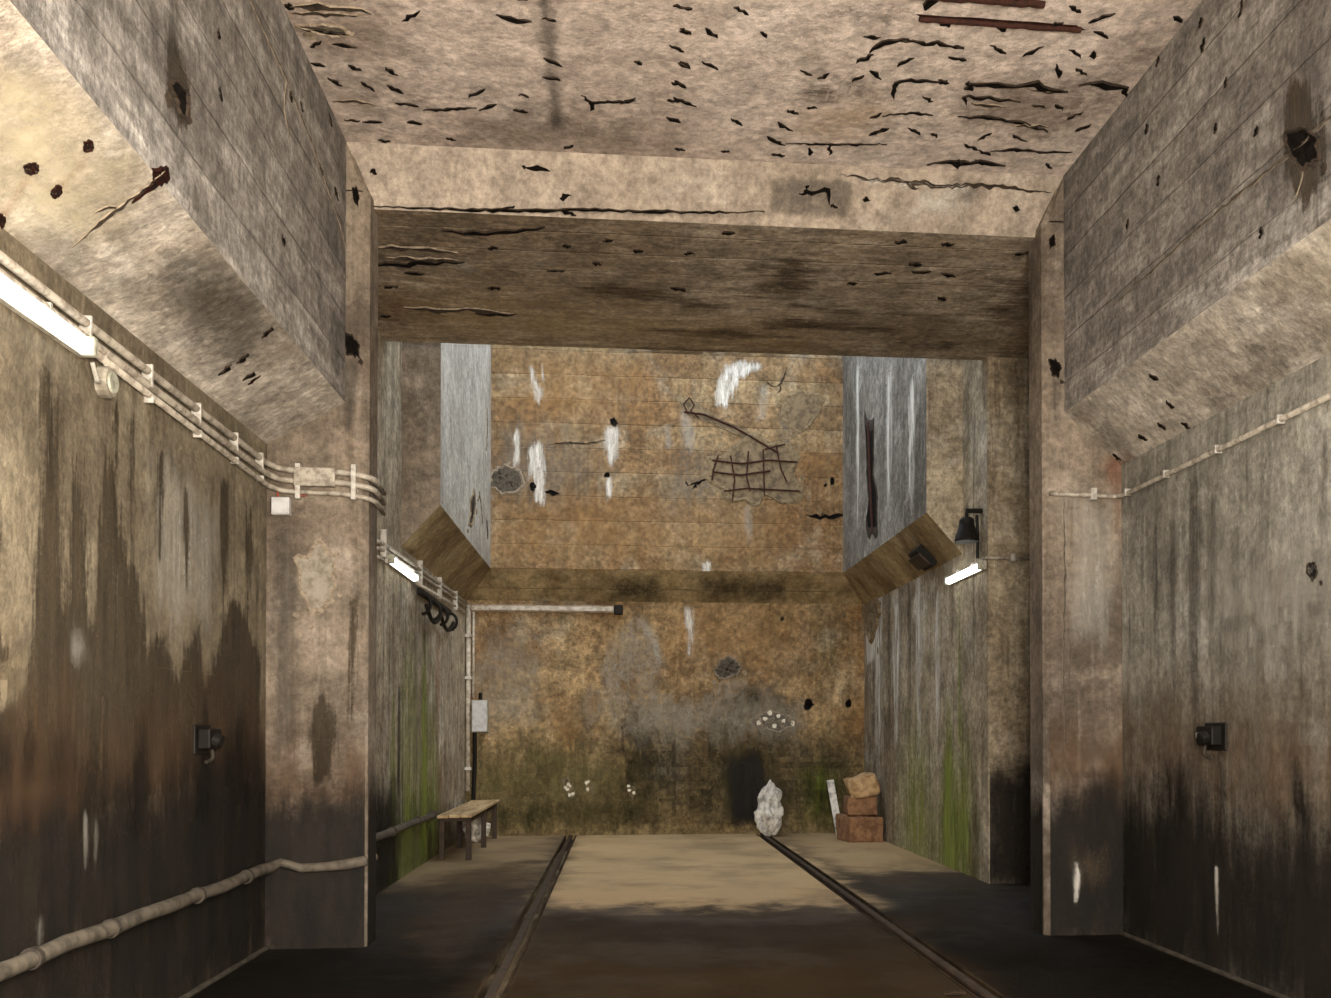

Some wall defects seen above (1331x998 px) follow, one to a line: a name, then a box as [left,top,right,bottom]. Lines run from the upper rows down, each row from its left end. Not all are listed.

crack [71,171,165,248]
spalling [1283,80,1327,210]
water stain [0,368,453,998]
water stain [939,736,1331,998]